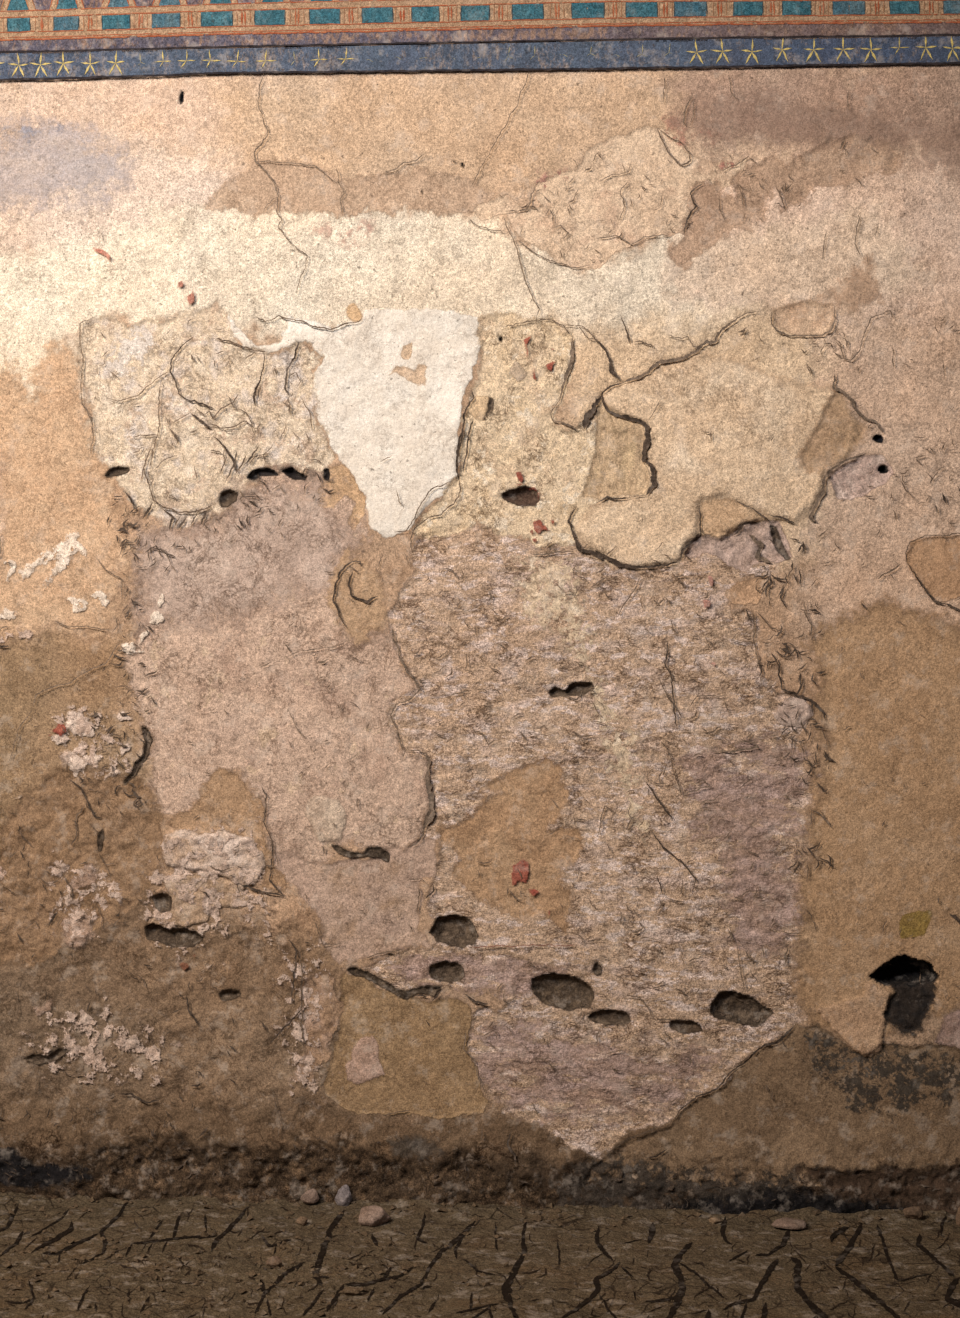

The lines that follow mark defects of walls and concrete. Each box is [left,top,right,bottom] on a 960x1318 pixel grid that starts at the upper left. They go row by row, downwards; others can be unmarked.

crack [473,72,529,183]
crack [254,75,345,293]
peeling [67,591,109,613]
peeling [51,728,131,778]
spalling [74,298,893,1160]